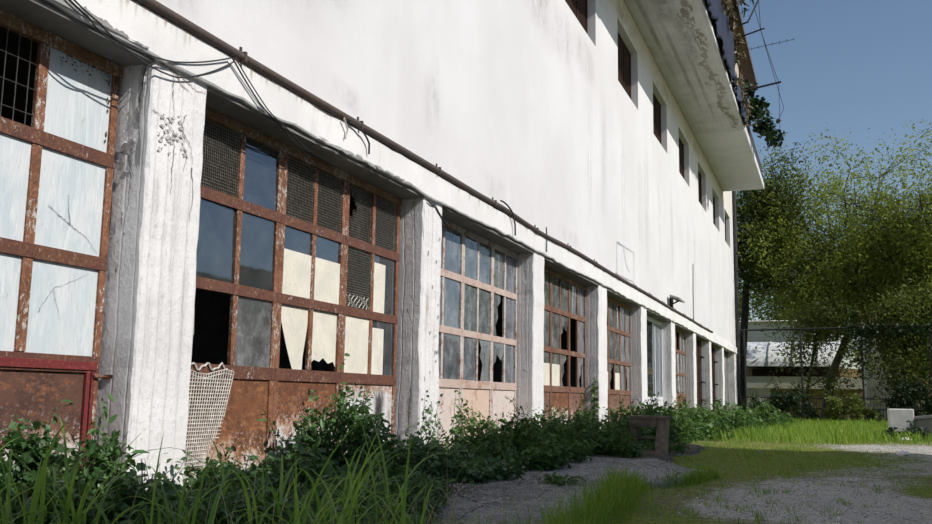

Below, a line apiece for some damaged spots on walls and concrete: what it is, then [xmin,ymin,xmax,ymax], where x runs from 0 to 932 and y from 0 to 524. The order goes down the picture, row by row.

crack [120,62,206,222]